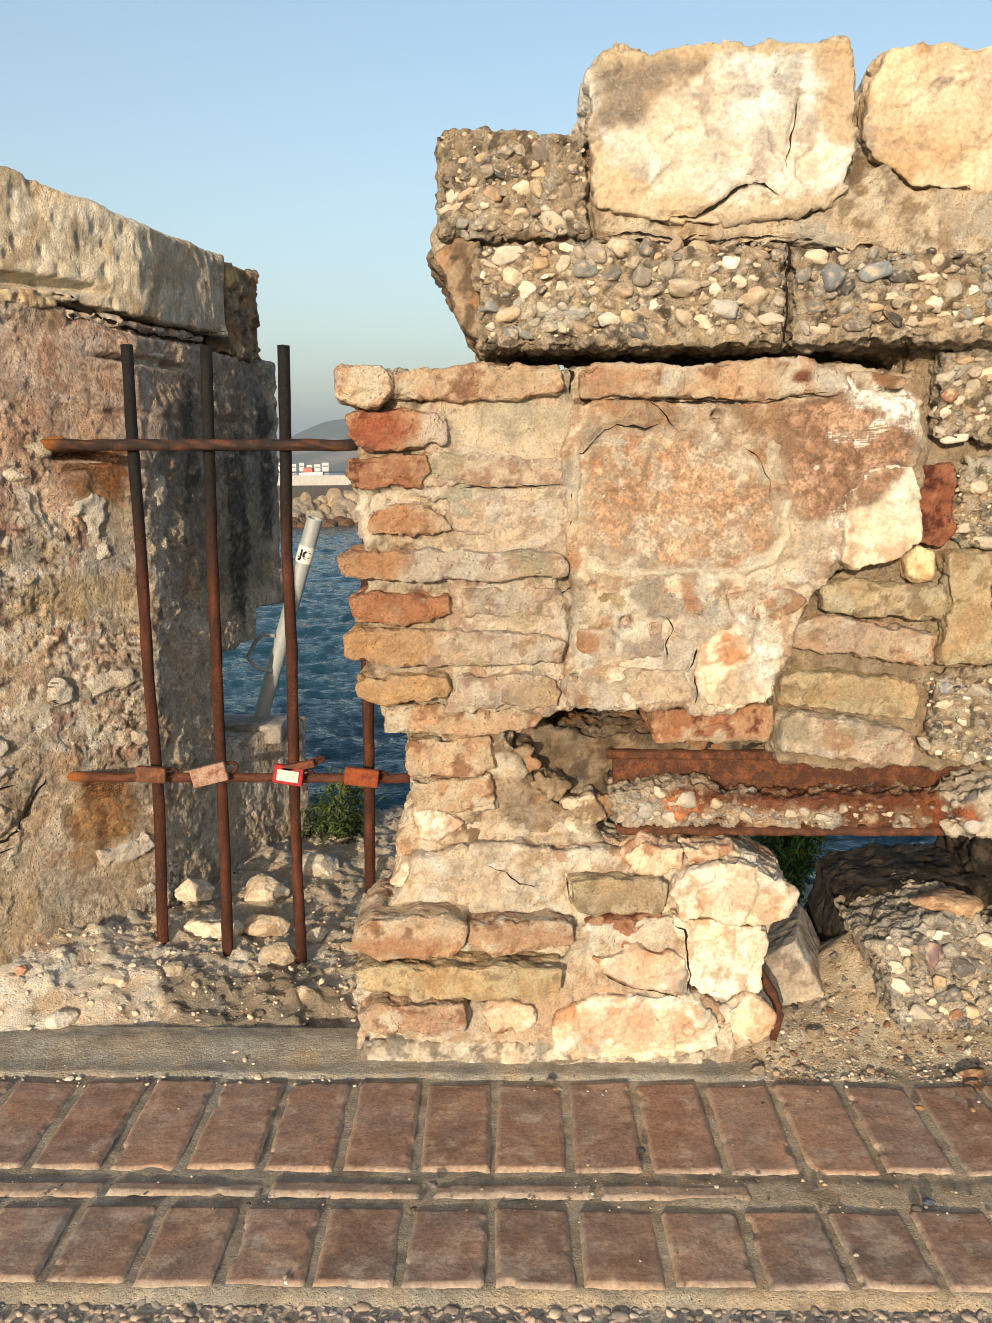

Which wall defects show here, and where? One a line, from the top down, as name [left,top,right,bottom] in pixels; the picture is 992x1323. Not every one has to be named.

crack [592,100,812,342]
corrosion [661,787,982,826]